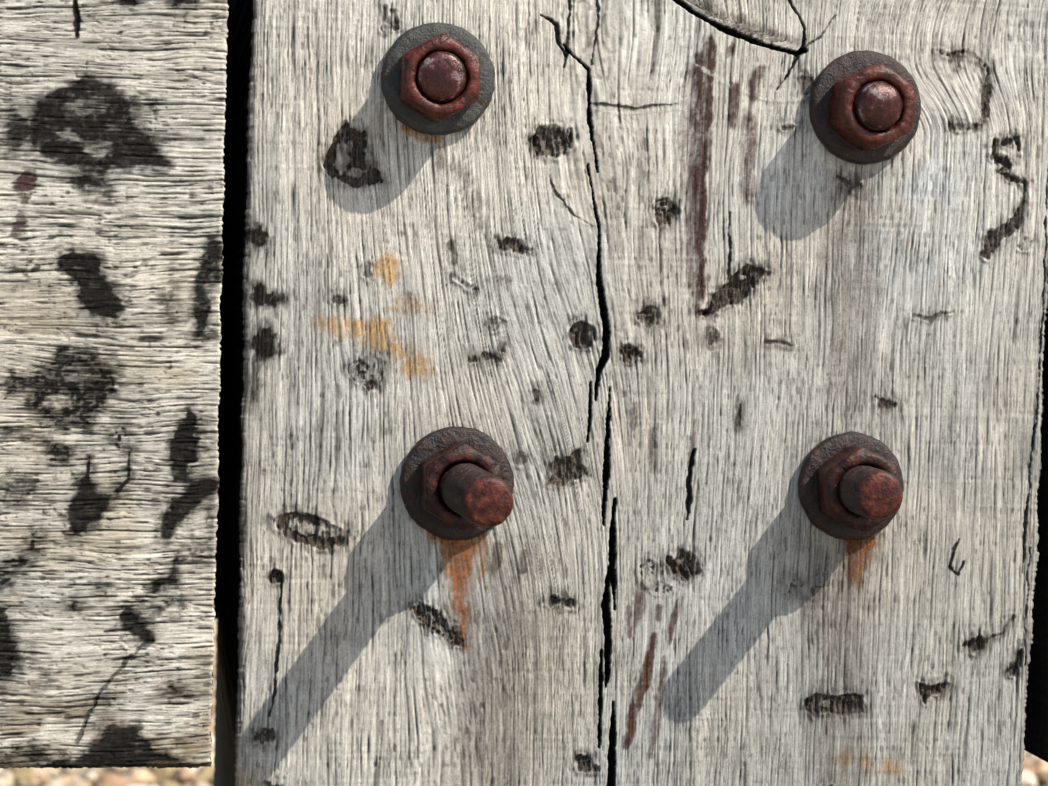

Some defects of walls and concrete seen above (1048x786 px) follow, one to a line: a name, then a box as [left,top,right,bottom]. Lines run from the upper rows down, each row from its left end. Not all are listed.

crack [672,0,830,90]
crack [725,212,733,281]
crack [540,0,675,786]
crack [685,448,696,520]
rust [428,532,487,649]
rust [844,536,876,584]